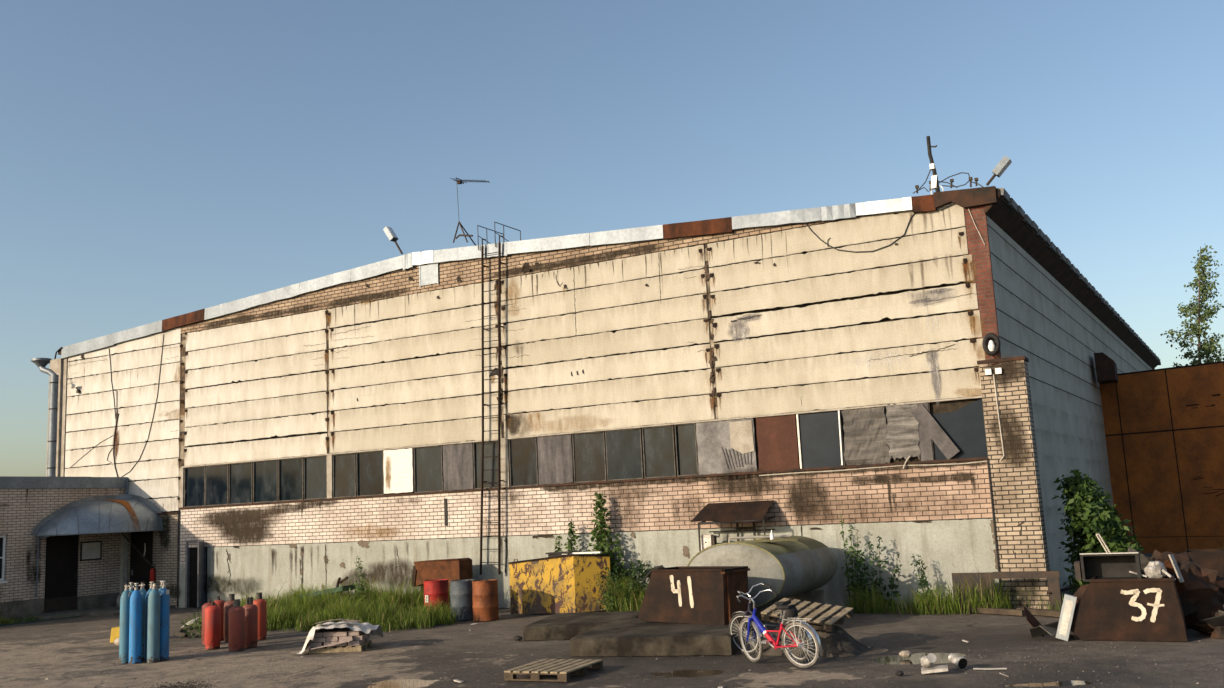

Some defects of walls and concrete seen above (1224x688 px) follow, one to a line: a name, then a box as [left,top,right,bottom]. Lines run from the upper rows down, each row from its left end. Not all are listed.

peeling [731,314,761,339]
water stain [992,414,1029,466]
rust [106,500,137,519]
water stain [208,500,336,564]
water stain [543,460,986,514]